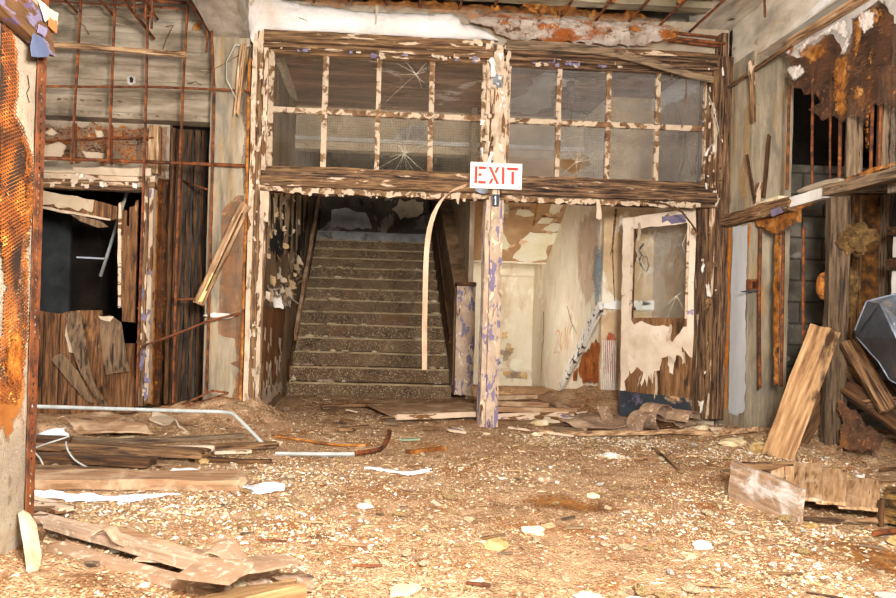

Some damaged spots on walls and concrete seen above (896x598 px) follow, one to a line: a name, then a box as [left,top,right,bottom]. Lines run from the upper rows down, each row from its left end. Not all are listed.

peeling [250,33,283,152]
peeling [431,39,588,163]
rust [0,136,33,441]
spalling [244,188,352,404]
peeling [392,193,429,220]
peeling [483,260,528,381]
peeling [486,197,568,263]
peeling [701,259,717,311]
peeling [705,135,723,206]
peeling [637,371,658,399]